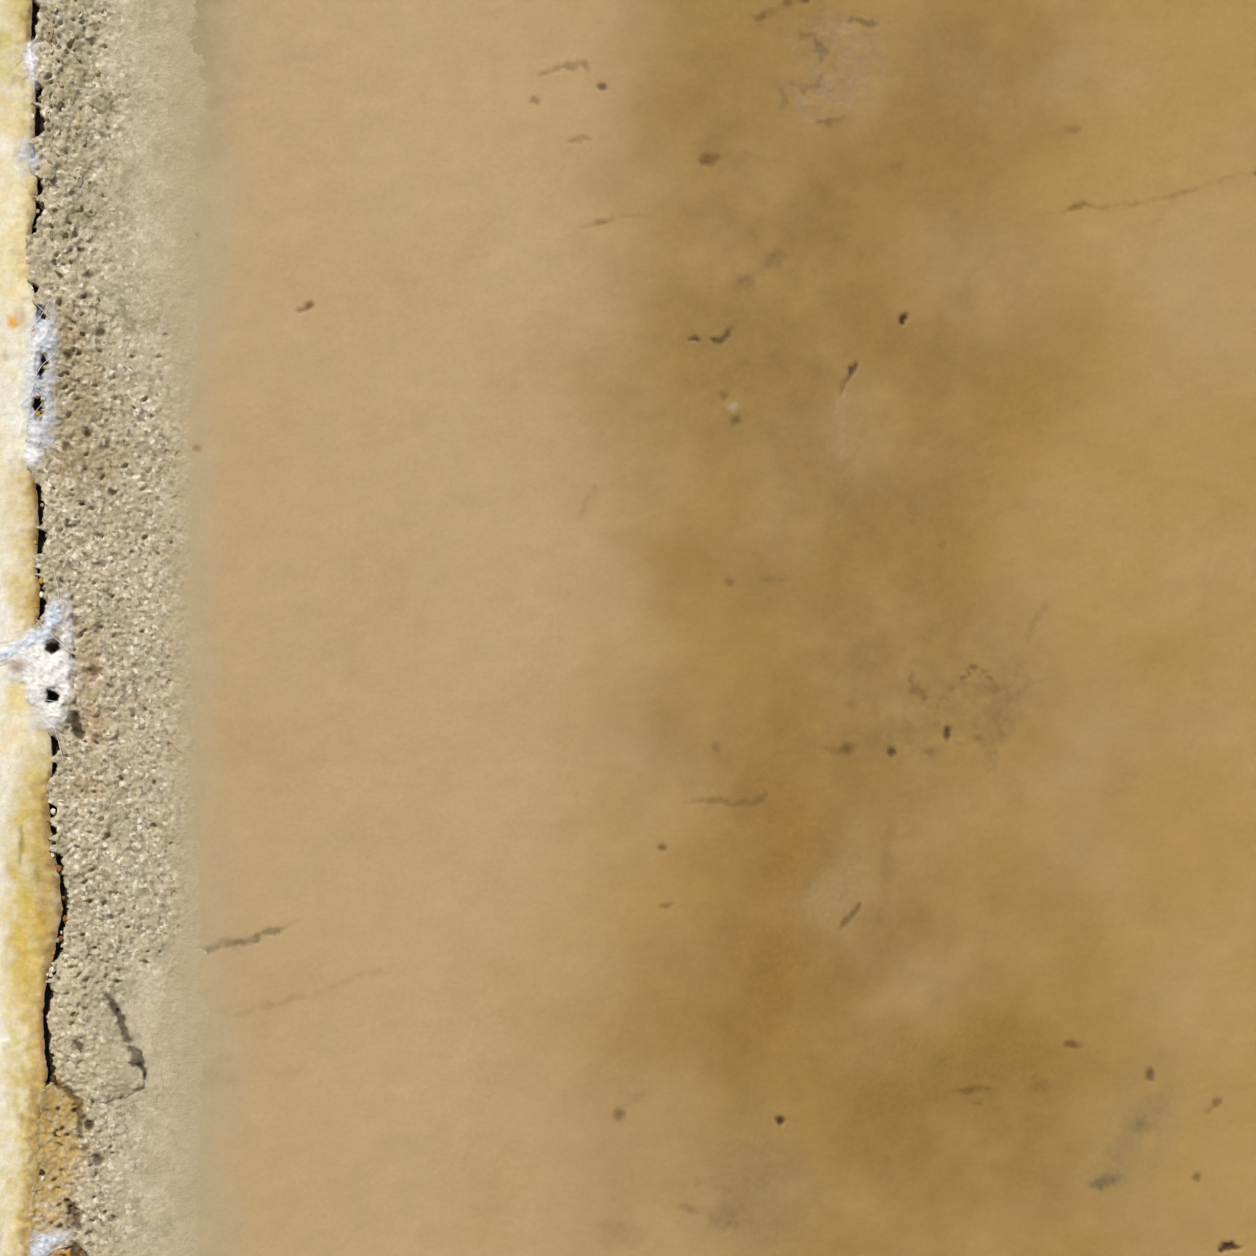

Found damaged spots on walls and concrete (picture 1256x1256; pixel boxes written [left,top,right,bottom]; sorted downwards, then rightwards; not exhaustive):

water stain [0,0,37,387]
crack [31,3,40,41]
crack [30,82,45,234]
spalling [42,0,118,247]
crack [31,285,48,422]
water stain [0,415,40,641]
crack [33,485,49,620]
water stain [0,674,63,1256]
crack [43,736,69,1082]
crack [196,918,311,970]
spalling [29,966,106,1256]
rust [28,1201,93,1256]